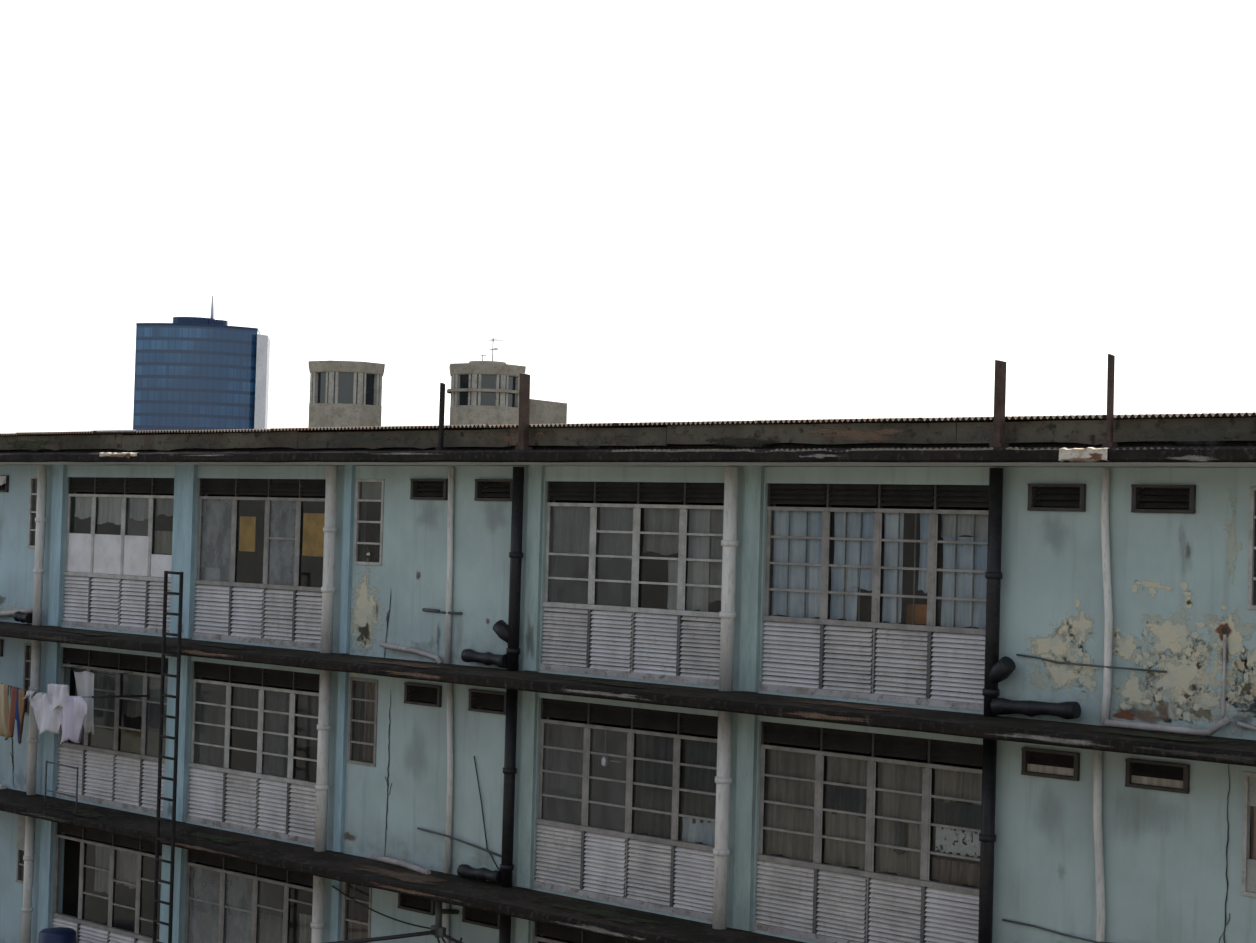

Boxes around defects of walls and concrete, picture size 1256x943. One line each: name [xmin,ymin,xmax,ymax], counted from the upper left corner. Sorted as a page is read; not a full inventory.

peeling [350,571,384,654]
peeling [1027,597,1098,699]
peeling [1109,580,1256,734]
rust [1216,623,1231,663]
crack [1219,764,1230,943]